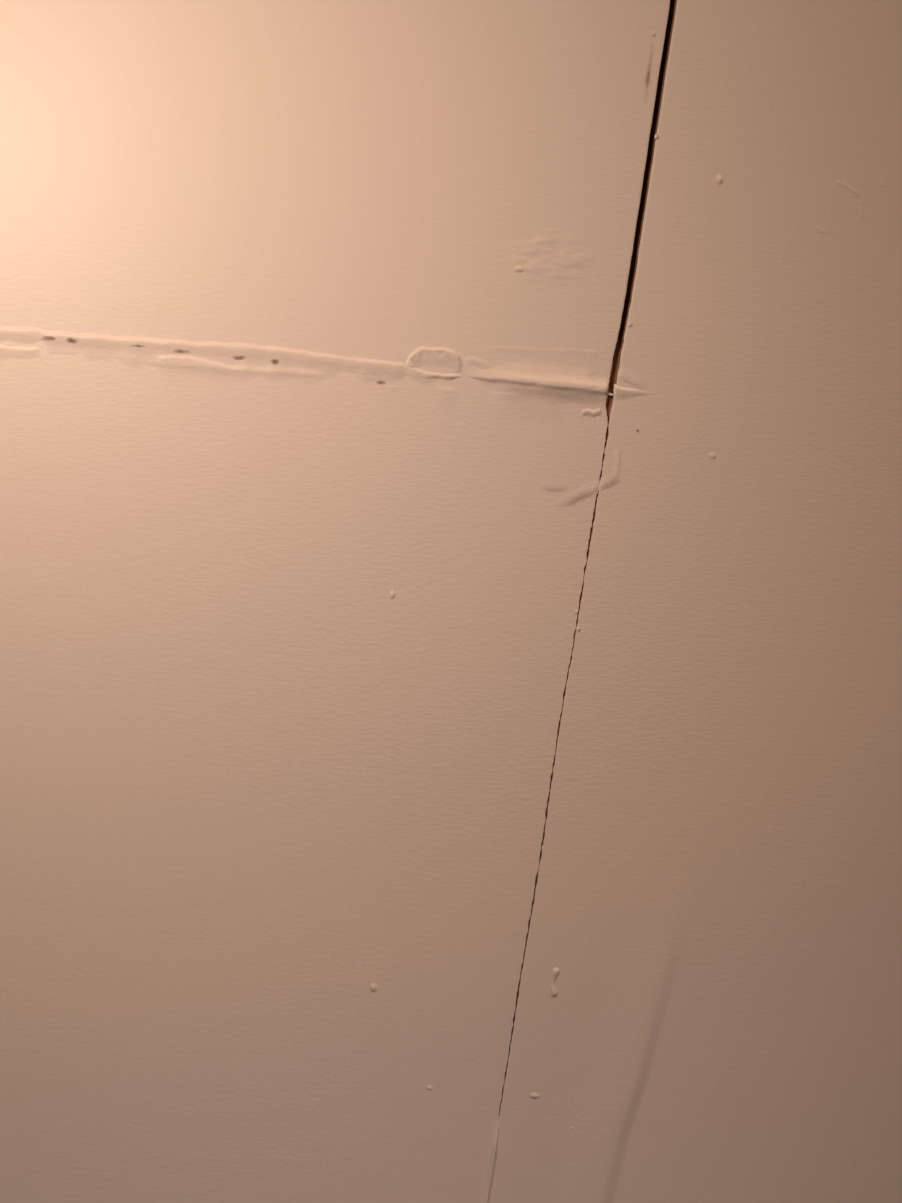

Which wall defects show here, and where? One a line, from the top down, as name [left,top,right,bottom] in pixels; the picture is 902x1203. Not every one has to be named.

crack [481,0,677,1203]